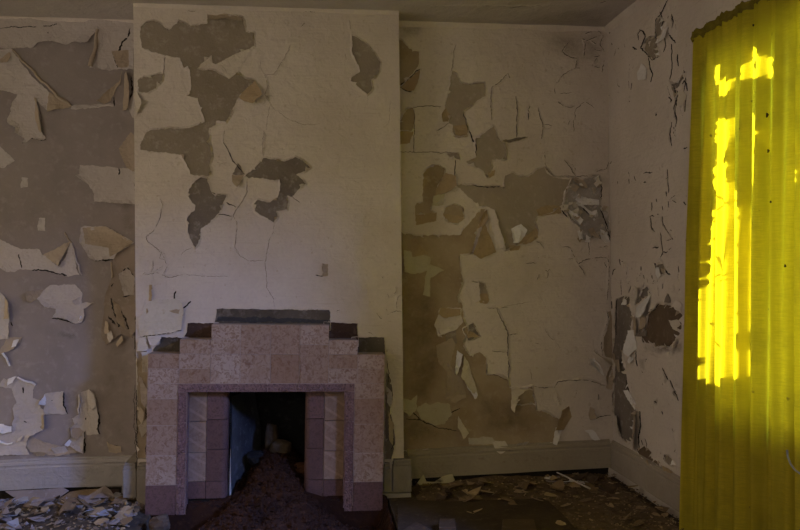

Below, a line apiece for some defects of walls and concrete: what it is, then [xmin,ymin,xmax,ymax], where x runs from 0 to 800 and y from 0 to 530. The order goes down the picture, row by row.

peeling [349,34,382,96]
peeling [399,38,421,92]
peeling [0,13,262,250]
crack [490,74,594,141]
crack [655,70,687,152]
crack [610,163,686,257]
peeling [0,226,136,347]
peeling [136,64,611,460]
peeling [0,293,22,366]
peeling [0,376,100,456]
crack [487,304,518,385]
peeling [589,284,684,473]